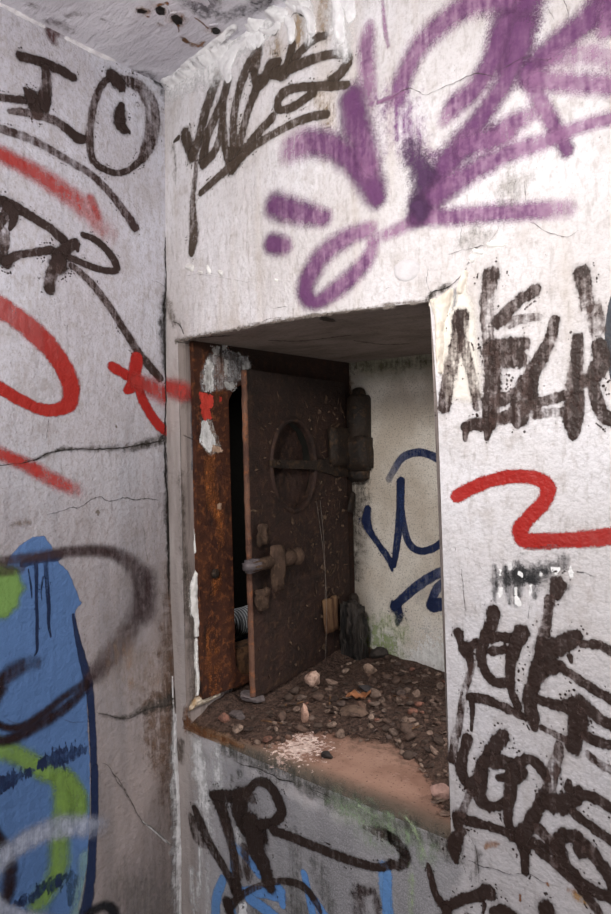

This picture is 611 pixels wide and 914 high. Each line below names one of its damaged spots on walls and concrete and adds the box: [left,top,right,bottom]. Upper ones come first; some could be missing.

peeling [166,300,427,393]
crack [0,237,170,593]
peeling [199,419,223,453]
damp [130,591,461,914]
crack [103,763,175,846]